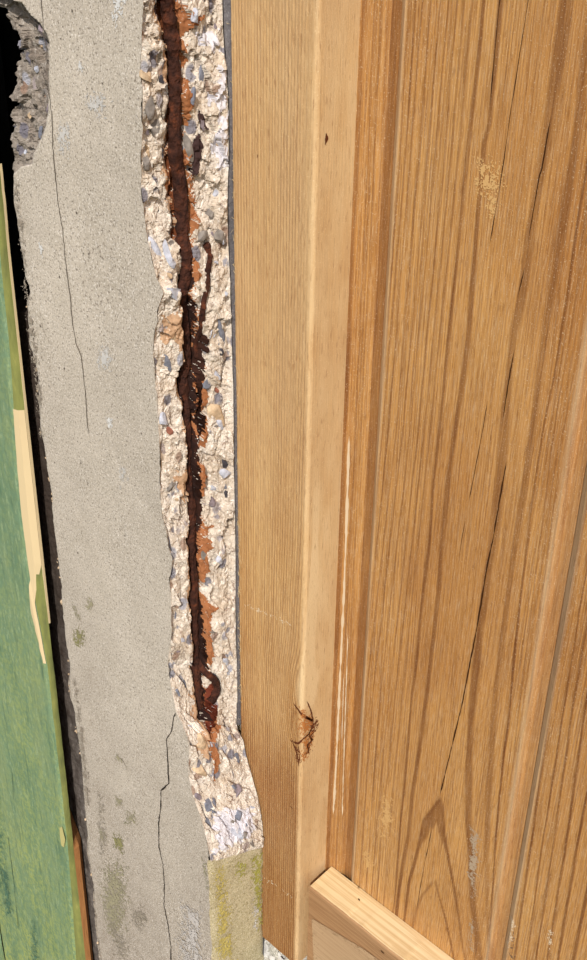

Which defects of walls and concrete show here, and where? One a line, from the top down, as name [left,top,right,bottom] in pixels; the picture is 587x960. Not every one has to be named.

spalling [0,0,61,664]
crack [41,0,88,428]
corrosion [152,0,221,781]
spalling [139,0,264,862]
crack [158,713,176,960]